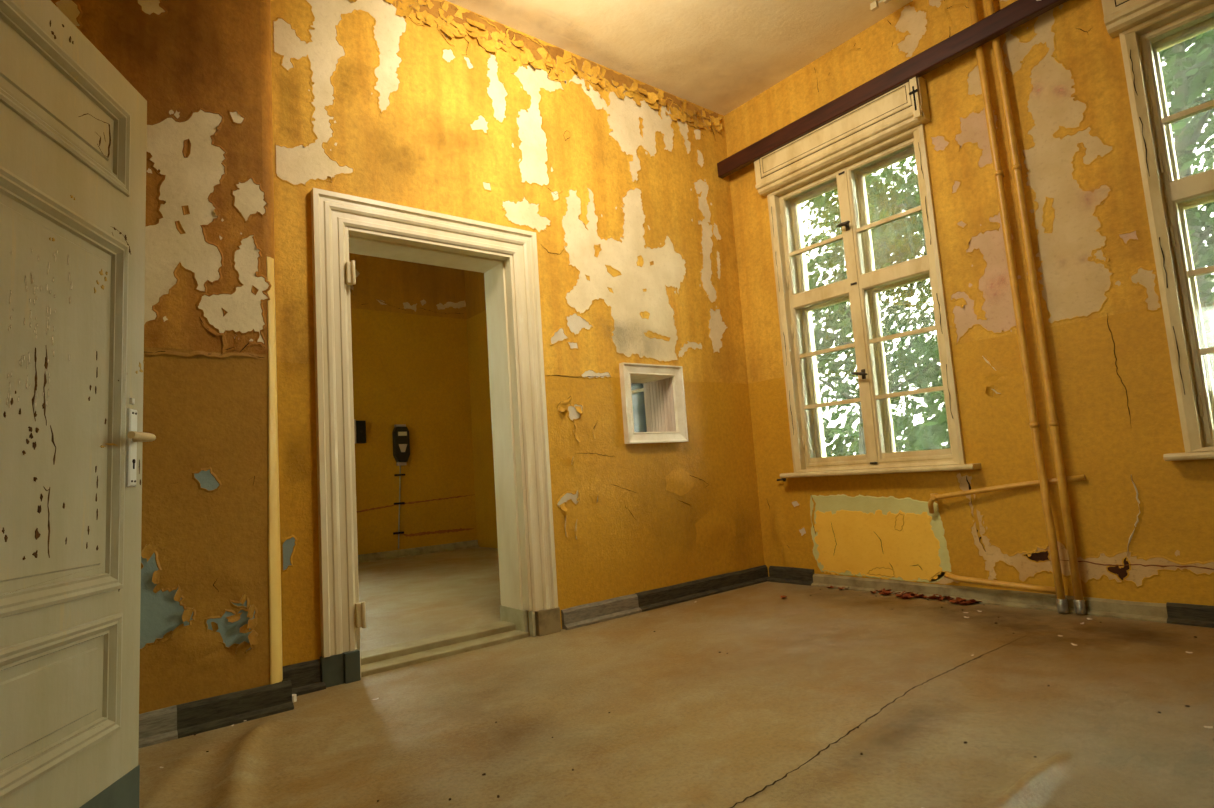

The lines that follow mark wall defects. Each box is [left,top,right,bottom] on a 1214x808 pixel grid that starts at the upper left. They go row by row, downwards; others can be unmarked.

peeling [50,0,83,44]
peeling [135,0,168,17]
peeling [930,60,1000,169]
peeling [114,107,271,345]
peeling [273,0,729,363]
peeling [950,0,1162,345]
crack [1107,314,1131,423]
peeling [140,544,259,657]
spalling [1022,549,1051,574]
spalling [1106,556,1131,583]
crack [1038,475,1214,570]